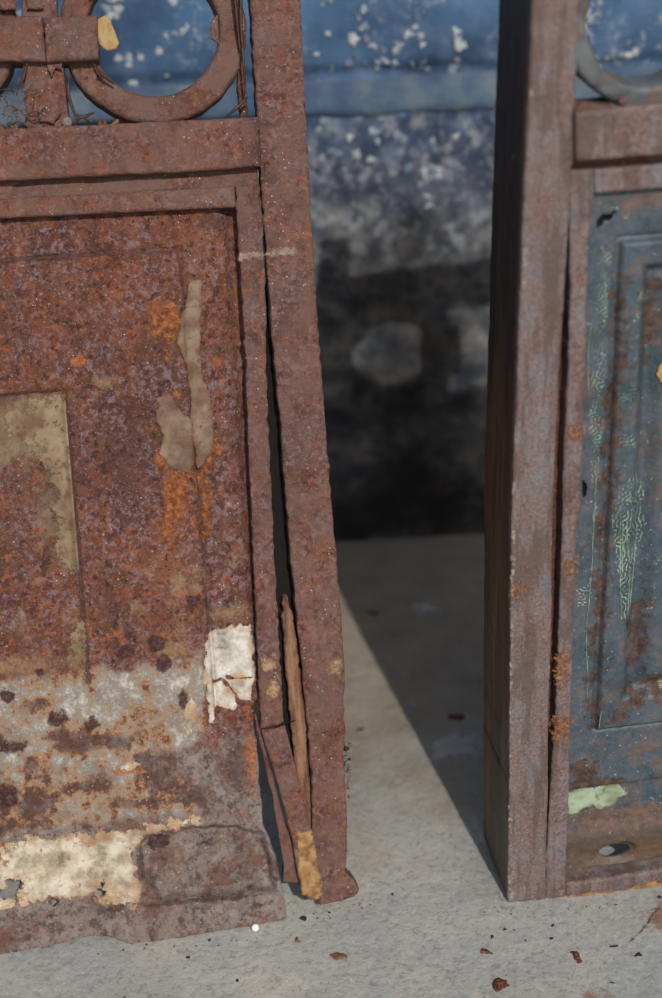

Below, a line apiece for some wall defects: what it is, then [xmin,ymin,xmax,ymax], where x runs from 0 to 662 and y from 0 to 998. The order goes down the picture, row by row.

peeling [156,279,214,473]
corrosion [583,267,662,689]
corrosion [148,636,172,672]
corrosion [0,690,15,704]
corrosion [48,709,70,726]
corrosion [178,689,188,710]
spalling [183,624,279,734]
corrosion [0,741,28,756]
peeling [113,761,141,772]
corrosion [0,785,20,808]
peeling [568,758,627,815]
peeling [0,812,201,912]